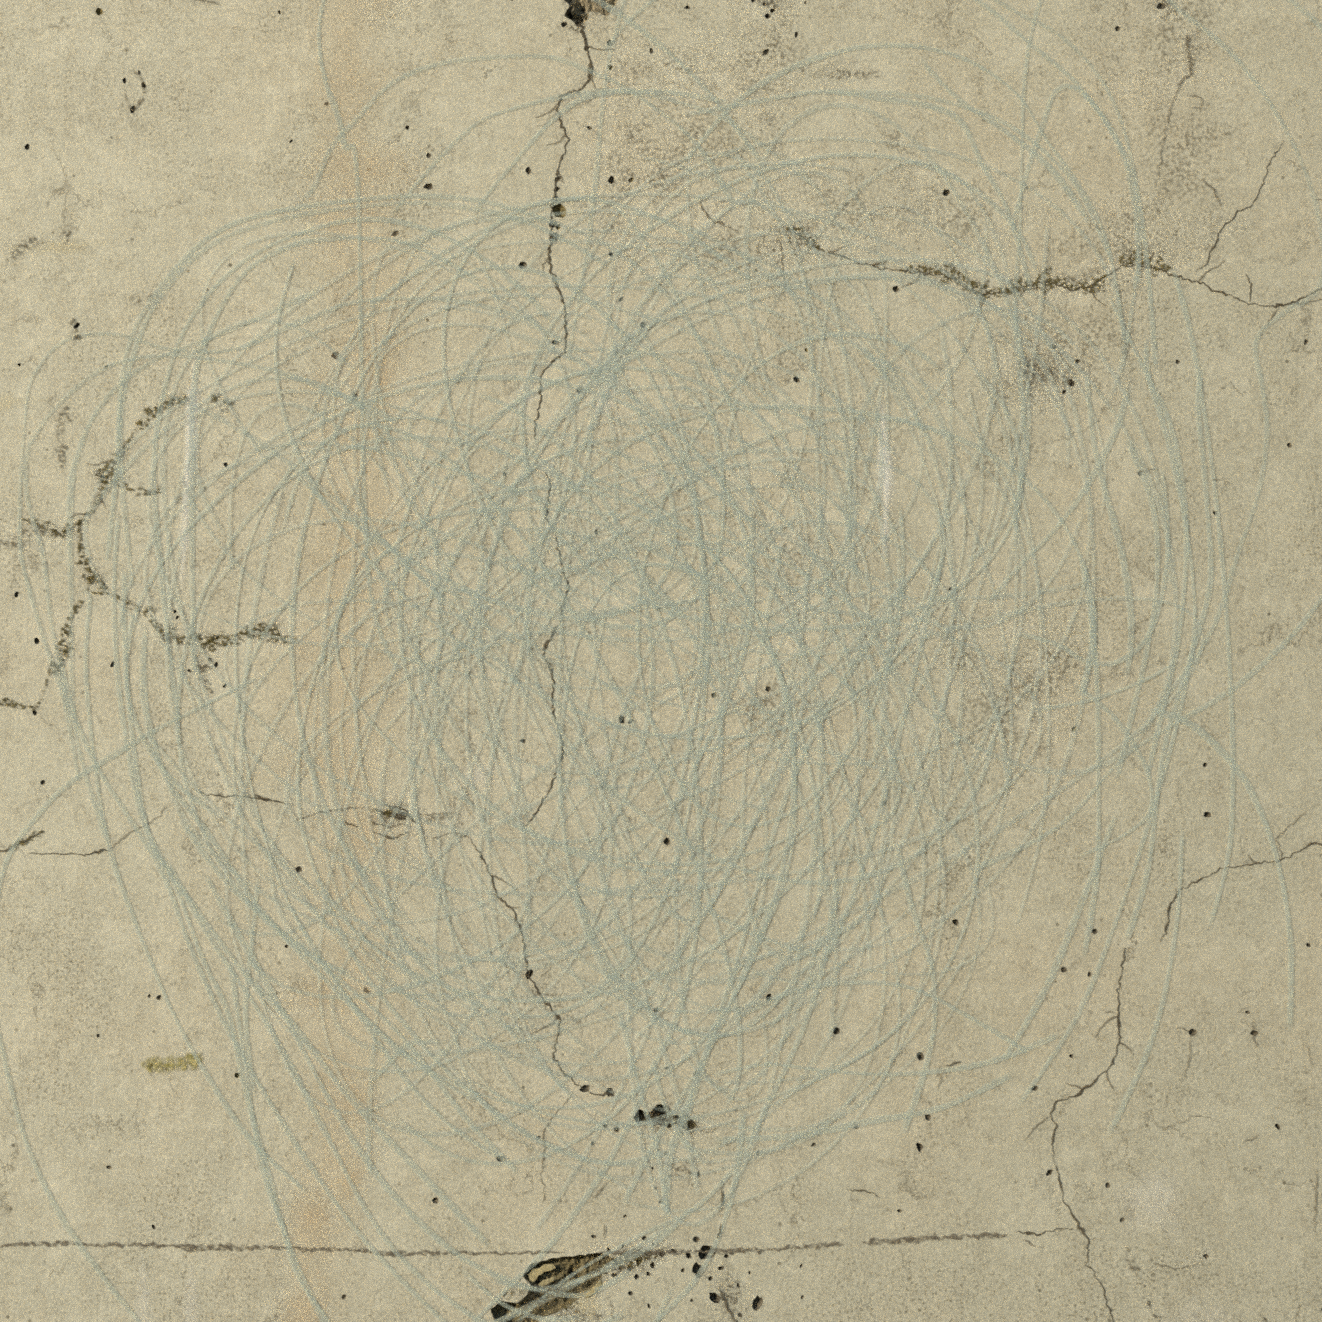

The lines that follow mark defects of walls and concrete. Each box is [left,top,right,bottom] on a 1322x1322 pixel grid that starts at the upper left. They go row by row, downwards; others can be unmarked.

spalling [561,0,618,29]
crack [534,23,614,440]
crack [773,142,1322,336]
crack [0,393,290,711]
crack [524,472,570,826]
crack [0,806,166,856]
crack [1160,812,1322,942]
crack [194,789,614,1203]
crack [593,948,1134,1322]
crack [0,1241,561,1257]
spalling [491,1235,729,1322]
spalling [738,1295,763,1317]